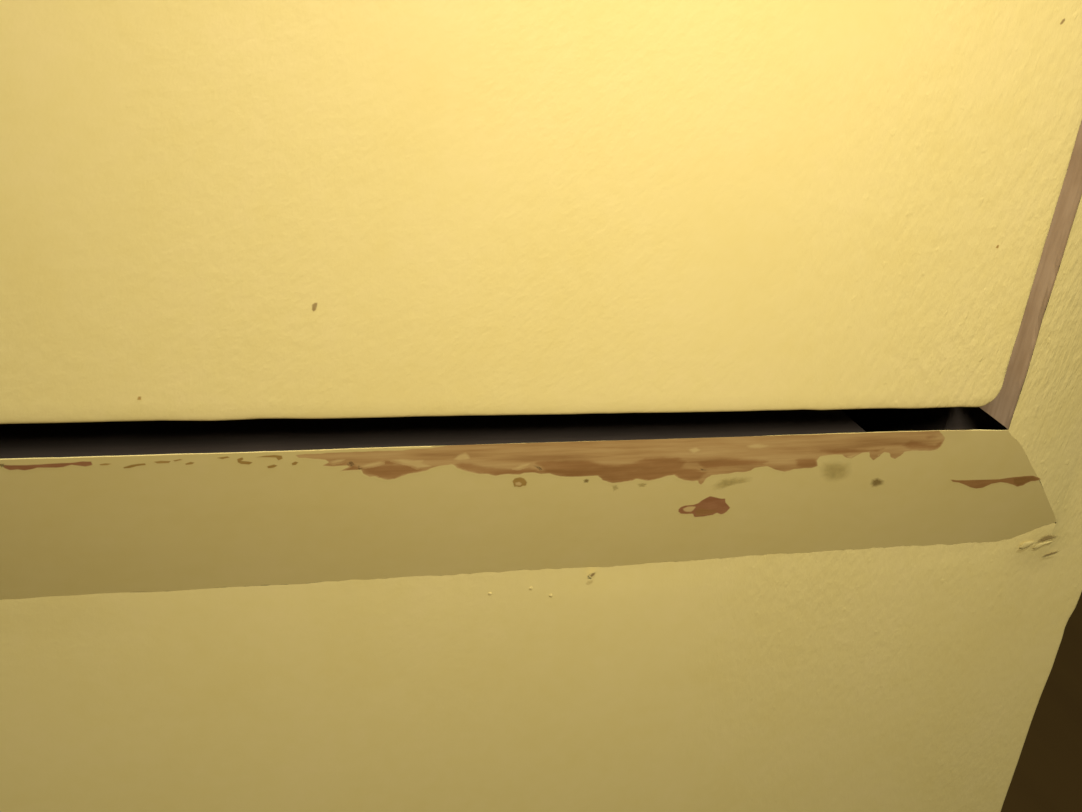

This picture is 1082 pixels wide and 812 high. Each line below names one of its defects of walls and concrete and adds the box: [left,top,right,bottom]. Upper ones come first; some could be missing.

peeling [293,431,948,518]
peeling [949,475,1041,489]